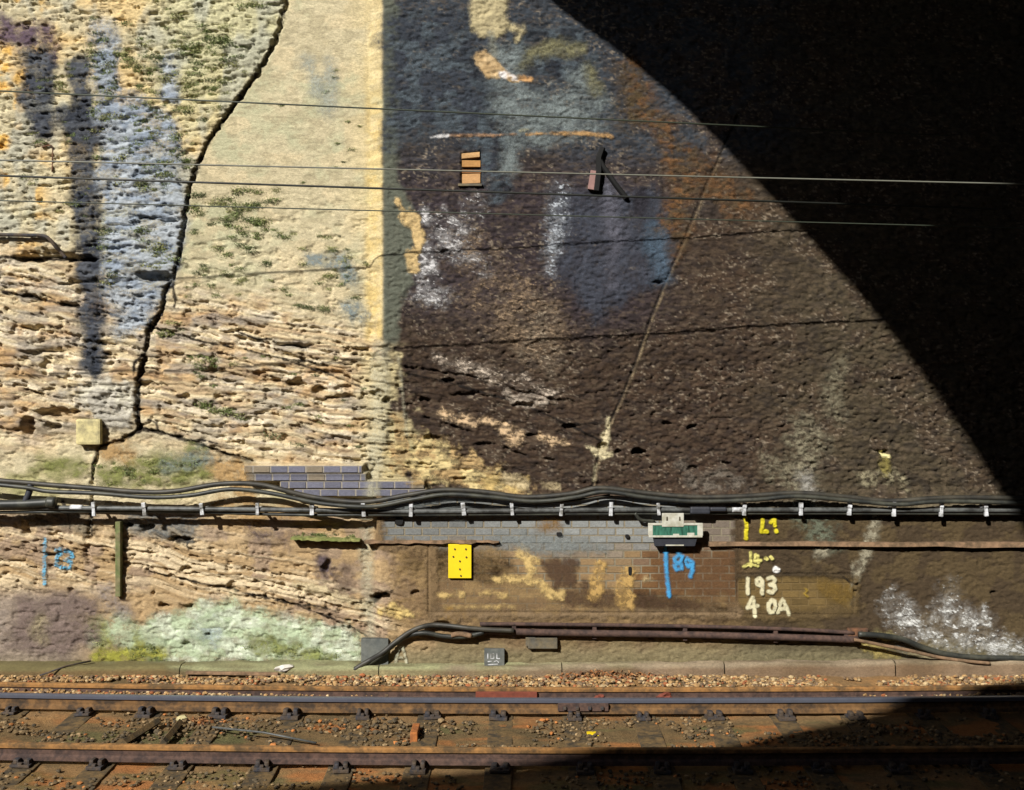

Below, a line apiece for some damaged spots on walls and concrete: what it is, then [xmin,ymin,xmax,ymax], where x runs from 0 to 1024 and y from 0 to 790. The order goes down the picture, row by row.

crack [0,4,359,535]
leakage [415,193,577,376]
leakage [191,598,238,647]
leakage [249,636,333,660]
leakage [888,587,1024,655]